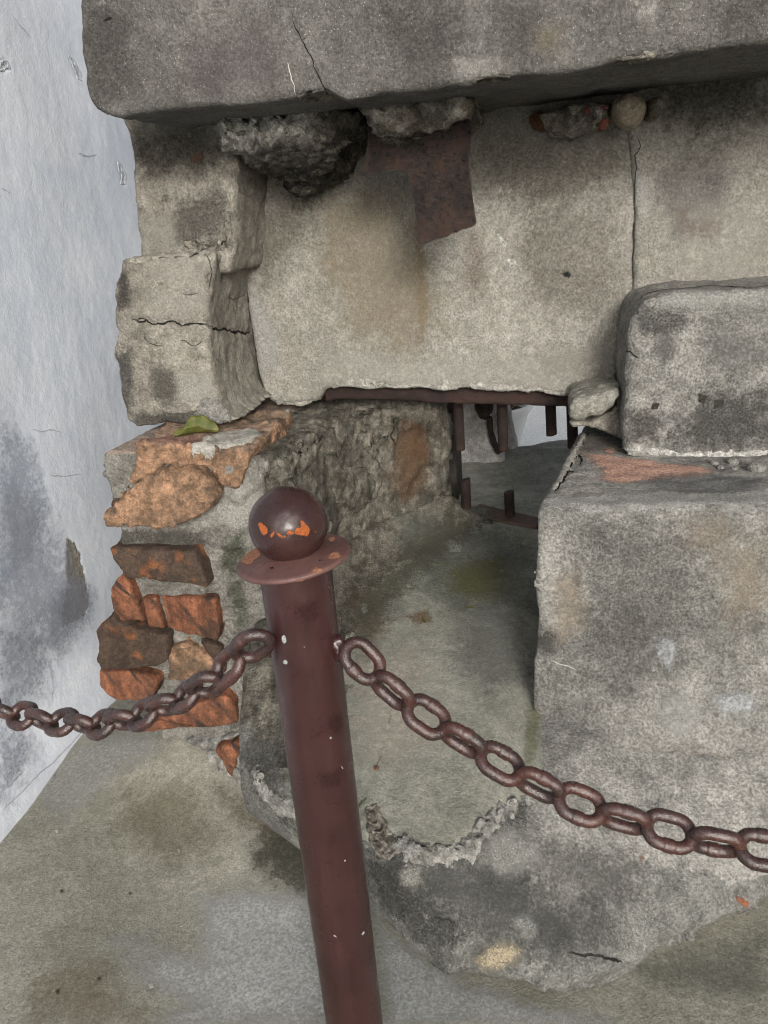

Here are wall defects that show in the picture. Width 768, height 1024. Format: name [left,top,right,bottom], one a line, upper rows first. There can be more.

crack [292,13,328,95]
spalling [217,89,484,198]
crack [632,137,767,305]
crack [131,221,263,386]
crack [554,432,589,492]
water stain [0,431,89,706]
spalling [365,795,518,869]
water stain [476,944,522,970]